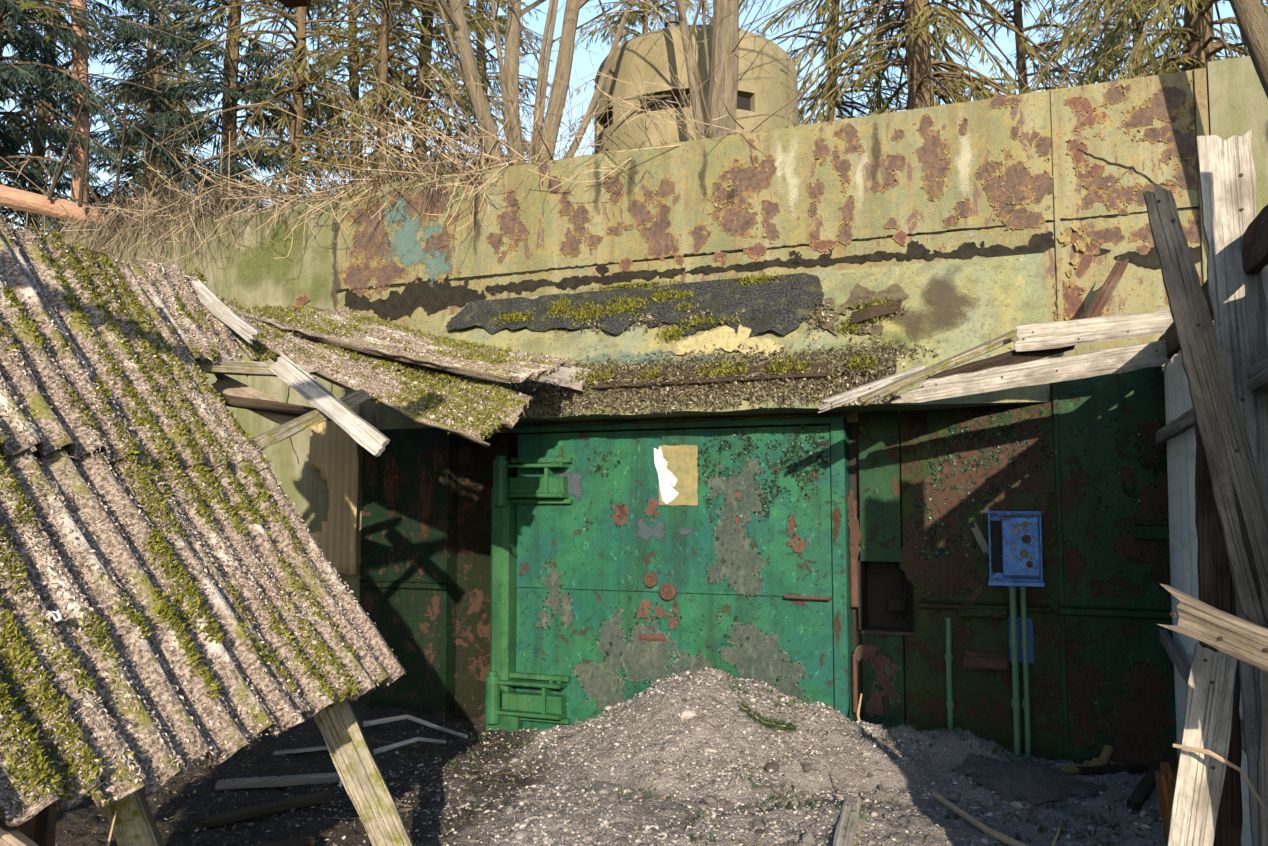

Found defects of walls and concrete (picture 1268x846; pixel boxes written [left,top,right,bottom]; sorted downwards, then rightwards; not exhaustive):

corrosion [340,182,457,299]
corrosion [547,153,783,266]
crack [336,225,1007,293]
corrosion [805,121,866,254]
corrosion [870,112,968,201]
corrosion [975,78,1209,322]
crack [1045,149,1200,221]
peeling [607,492,629,536]
peeling [645,498,661,523]
peeling [697,424,830,596]
peeling [536,560,575,629]
peeling [572,600,812,711]